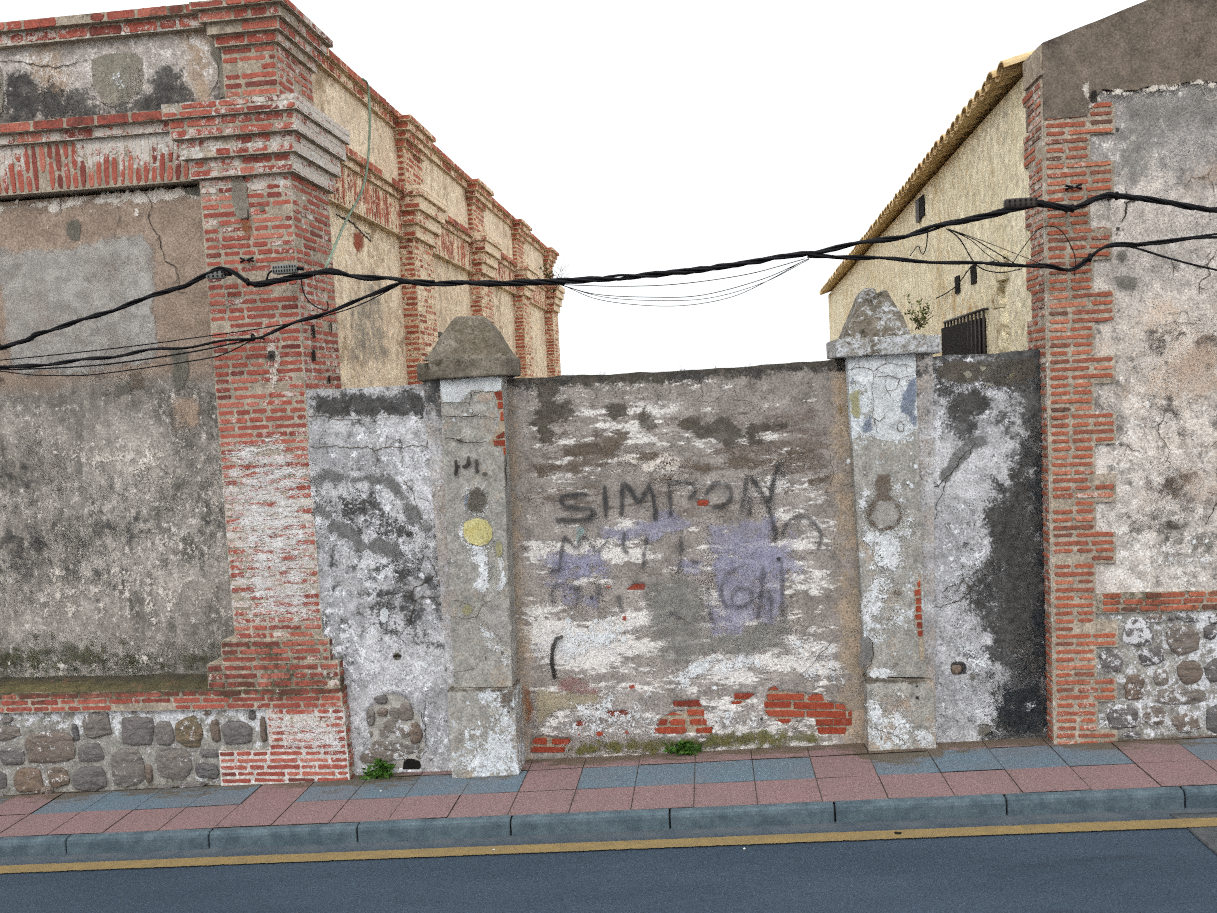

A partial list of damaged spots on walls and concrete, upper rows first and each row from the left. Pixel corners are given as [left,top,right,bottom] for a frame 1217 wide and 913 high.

flaking render [1089,79,1217,107]
crack [1174,167,1214,190]
crack [114,191,186,293]
crack [1164,250,1217,332]
damp [598,363,835,386]
damp [509,373,814,481]
crack [1118,407,1185,471]
peeling [23,433,321,633]
damp [315,481,440,649]
mould [934,355,1048,739]
spalling [530,629,938,753]
peeling [935,642,991,716]